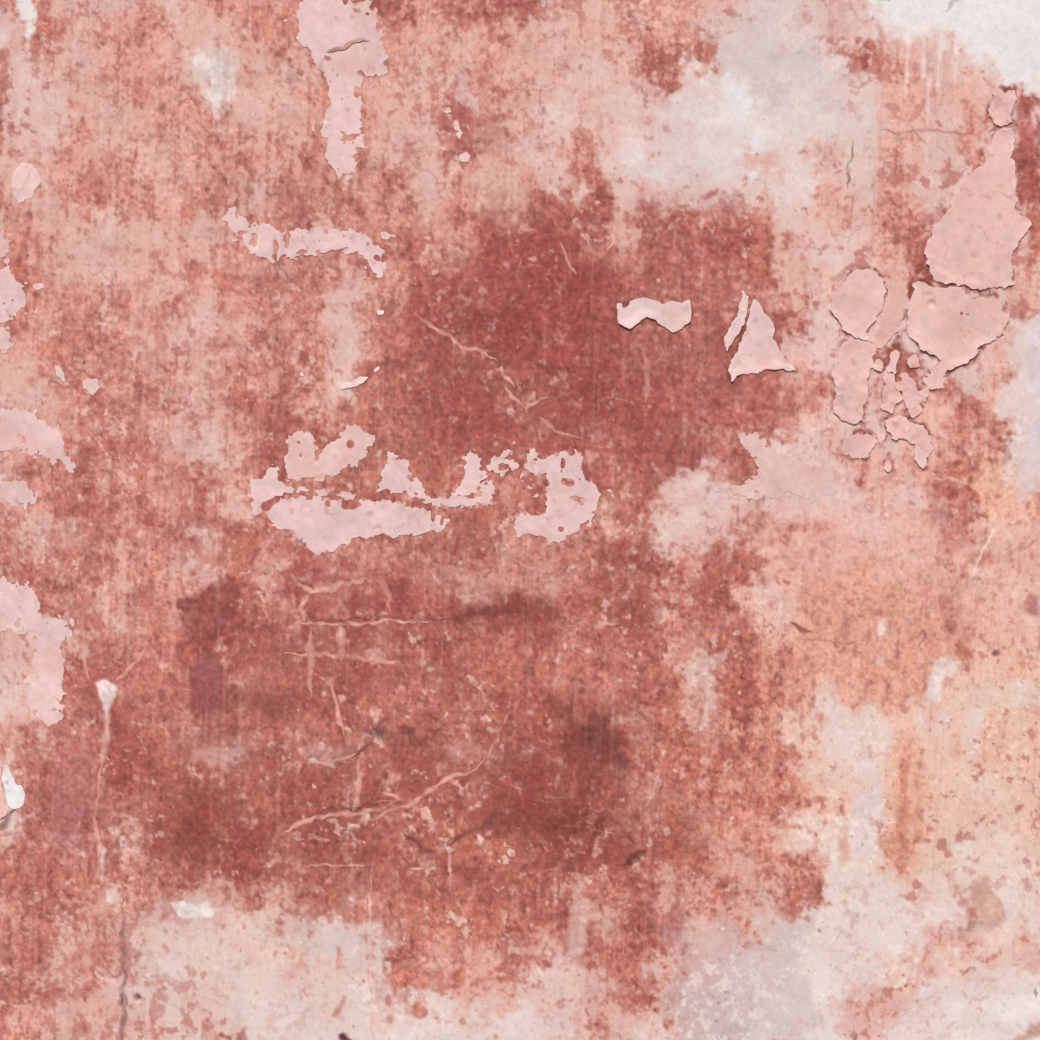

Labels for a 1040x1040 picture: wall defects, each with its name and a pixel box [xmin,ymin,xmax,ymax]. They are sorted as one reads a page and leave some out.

peeling [283,0,394,181]
peeling [222,206,395,279]
peeling [613,291,696,340]
peeling [715,79,1032,569]
peeling [0,474,38,520]
peeling [0,408,76,473]
peeling [248,424,614,557]
peeling [0,566,75,726]
crack [564,620,619,628]
peeling [0,758,26,819]
crack [277,572,522,890]
crack [309,863,406,1040]